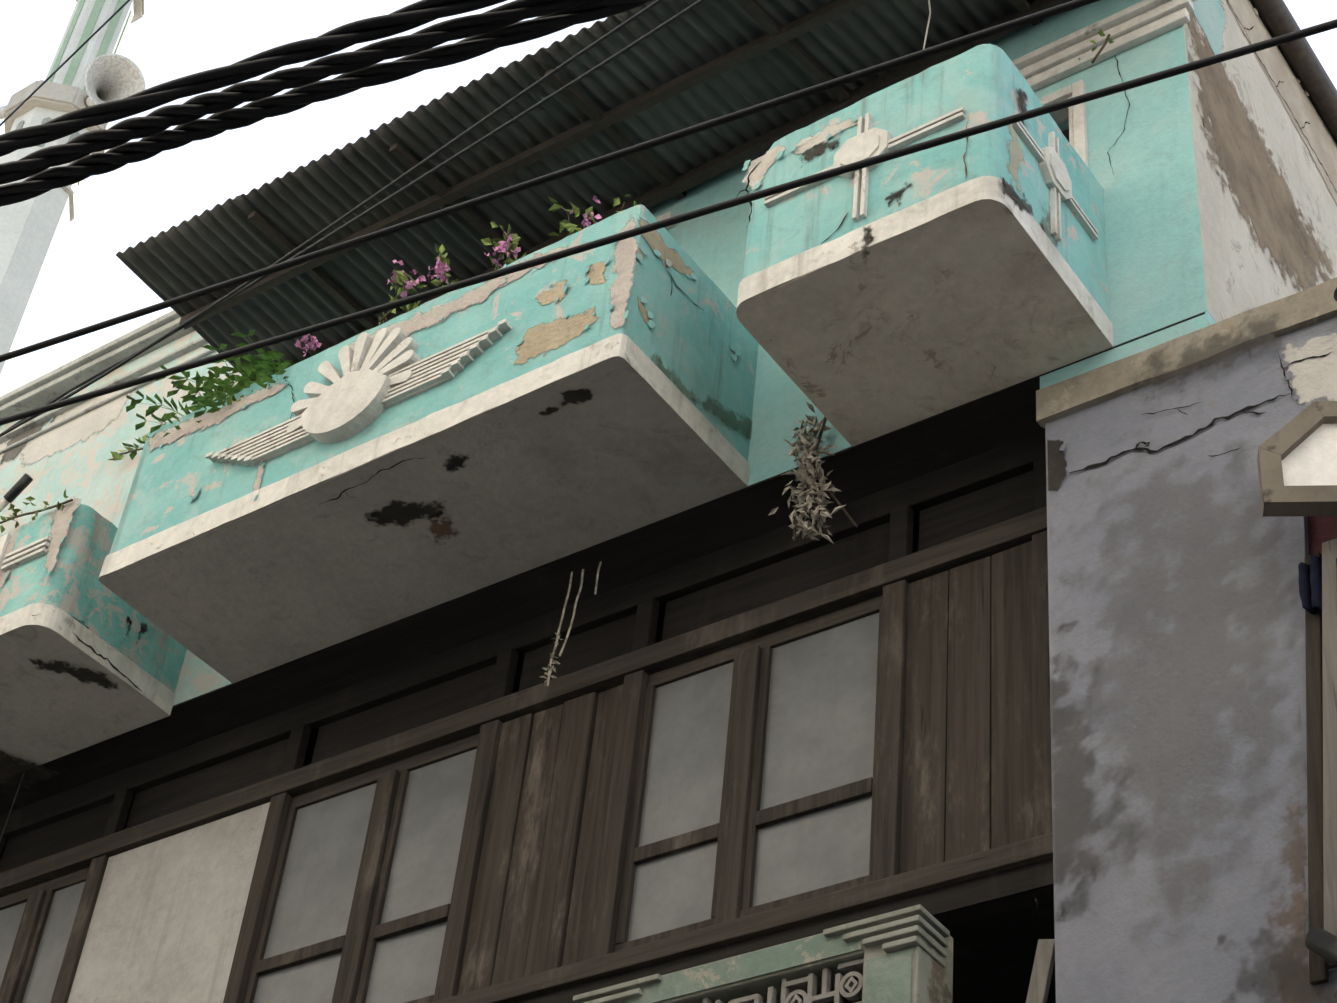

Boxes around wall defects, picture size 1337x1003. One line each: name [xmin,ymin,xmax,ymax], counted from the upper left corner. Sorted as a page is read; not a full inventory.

peeling [742,113,859,190]
crack [1107,58,1130,174]
flaking render [1193,0,1337,204]
peeling [348,247,568,351]
peeling [514,217,698,364]
water stain [443,455,469,472]
crack [1068,352,1331,474]
water stain [365,500,458,542]
water stain [29,659,118,689]
water stain [0,750,62,796]